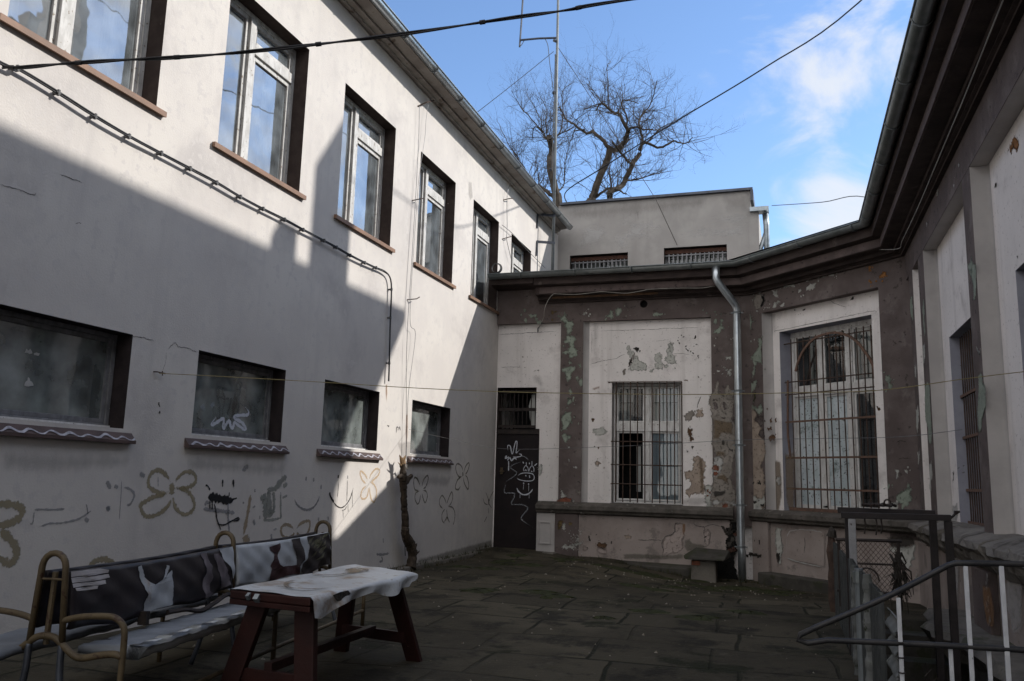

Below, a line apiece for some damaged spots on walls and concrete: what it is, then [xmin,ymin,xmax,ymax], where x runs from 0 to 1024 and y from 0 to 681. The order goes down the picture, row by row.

peeling [556,307,608,468]
peeling [622,335,699,375]
flaking render [683,356,762,558]
flaking render [750,274,837,509]